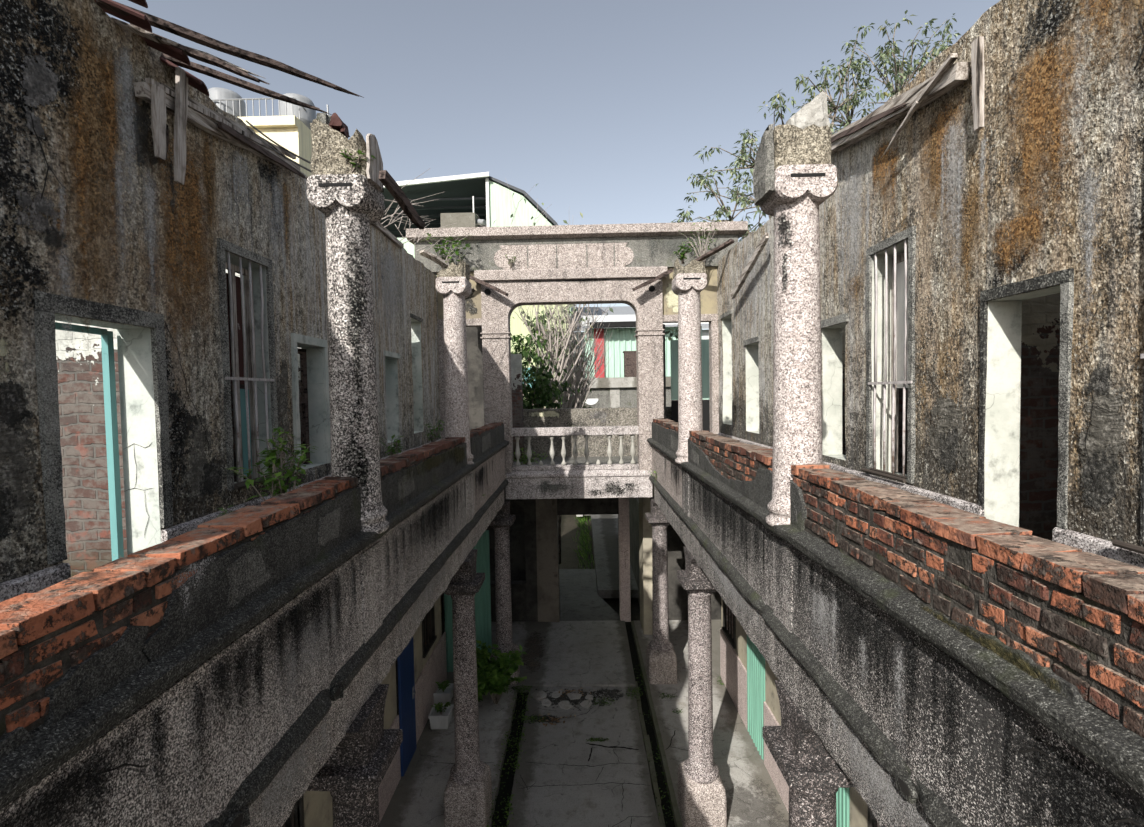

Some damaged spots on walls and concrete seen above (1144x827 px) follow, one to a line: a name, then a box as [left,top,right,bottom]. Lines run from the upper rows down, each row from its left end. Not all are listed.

leakage [1019,0,1083,74]
leakage [0,0,84,329]
leakage [116,53,134,255]
leakage [941,126,964,237]
leakage [986,244,1030,288]
leakage [1085,174,1095,285]
leakage [176,557,215,612]
leakage [191,566,357,810]
leakage [797,558,963,827]
leakage [0,706,170,827]
leakage [247,717,328,827]
leakage [995,712,1144,827]